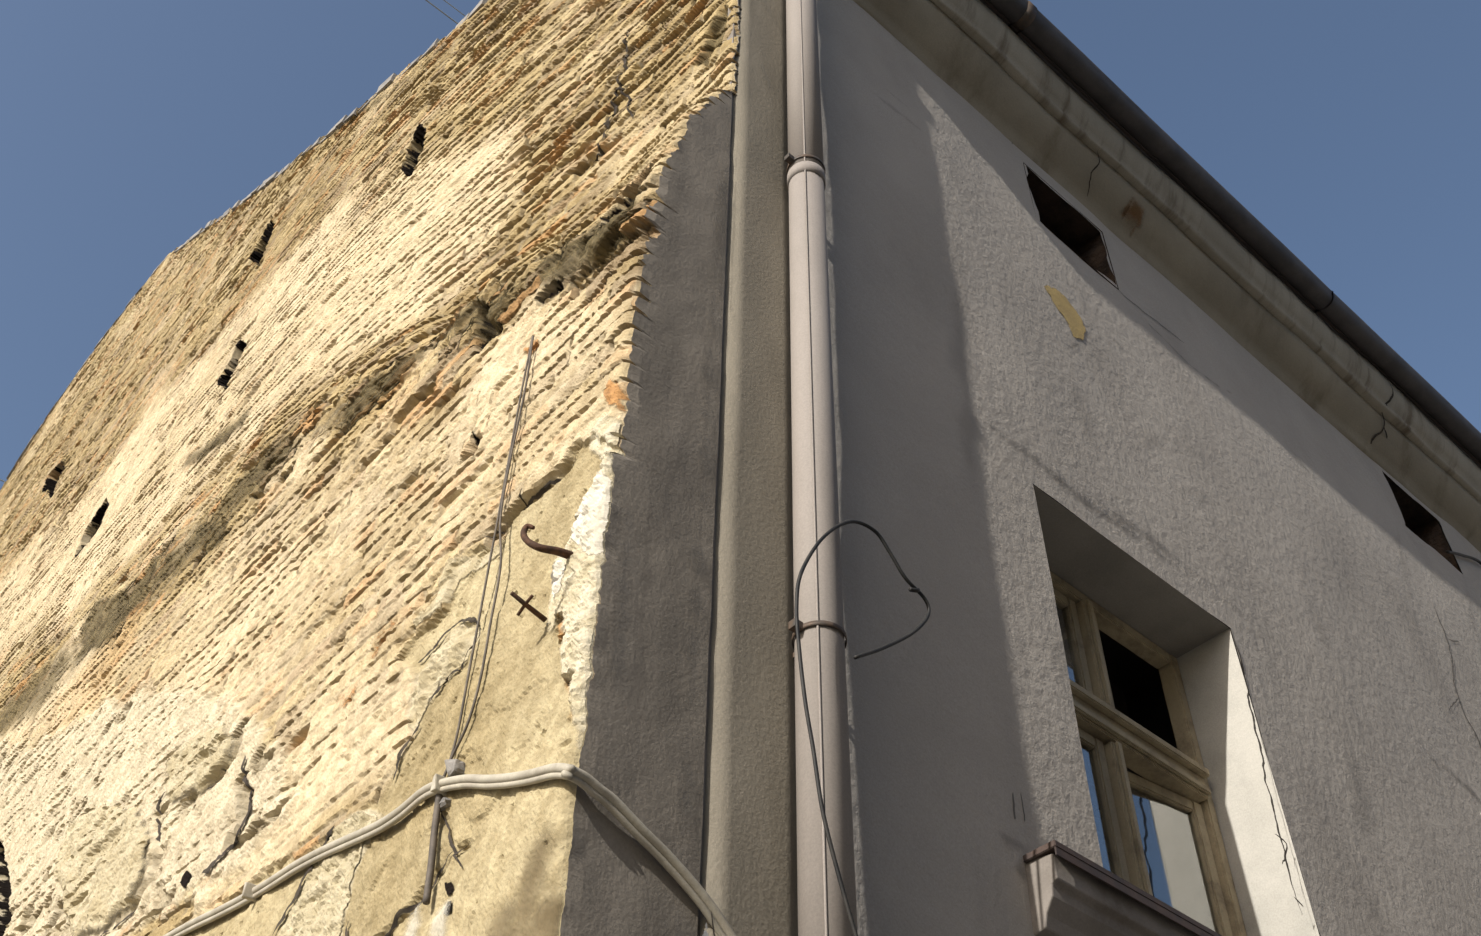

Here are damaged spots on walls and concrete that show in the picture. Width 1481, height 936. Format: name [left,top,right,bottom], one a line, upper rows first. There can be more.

crack [1370,384,1394,444]
spalling [547,379,629,747]
spalling [408,623,479,731]
crack [1435,609,1481,747]
crack [1231,632,1303,910]
spalling [278,812,377,936]
crack [385,811,472,936]